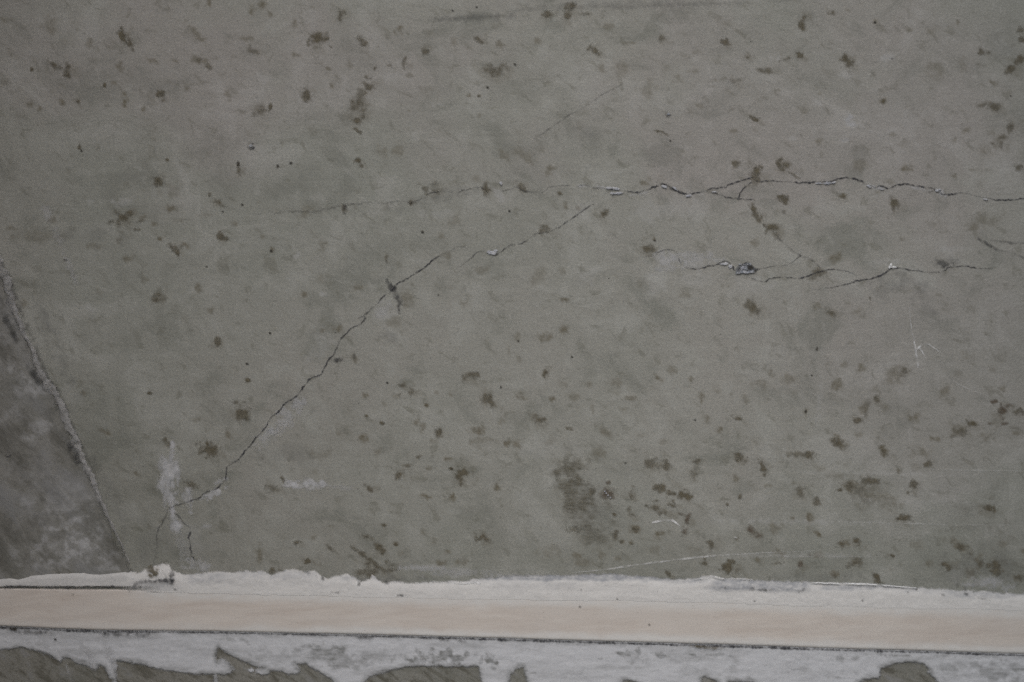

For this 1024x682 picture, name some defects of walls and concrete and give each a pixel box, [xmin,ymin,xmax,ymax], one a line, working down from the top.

crack [564,177,956,224]
crack [472,241,525,257]
crack [692,258,914,285]
crack [181,256,438,504]
peeling [0,647,333,682]
peeling [365,665,482,682]
peeling [509,667,527,682]
peeling [861,662,938,682]